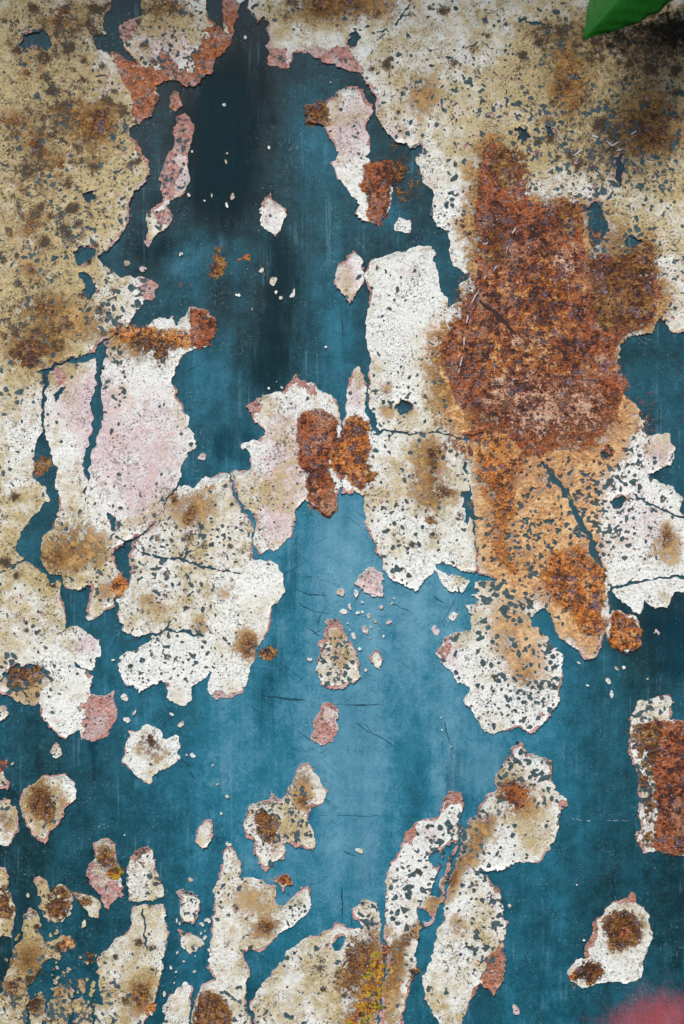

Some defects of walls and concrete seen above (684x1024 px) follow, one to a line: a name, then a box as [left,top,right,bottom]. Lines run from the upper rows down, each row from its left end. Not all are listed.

rust [2,294,217,371]
crack [130,544,244,575]
peeling [0,0,684,785]
rust [296,385,395,519]
crack [373,427,477,556]
rust [406,132,681,685]
crack [539,457,684,614]
rust [627,715,684,856]
peeling [628,694,684,856]
peeling [0,740,568,1024]
peeling [567,891,653,988]
rust [601,907,646,954]